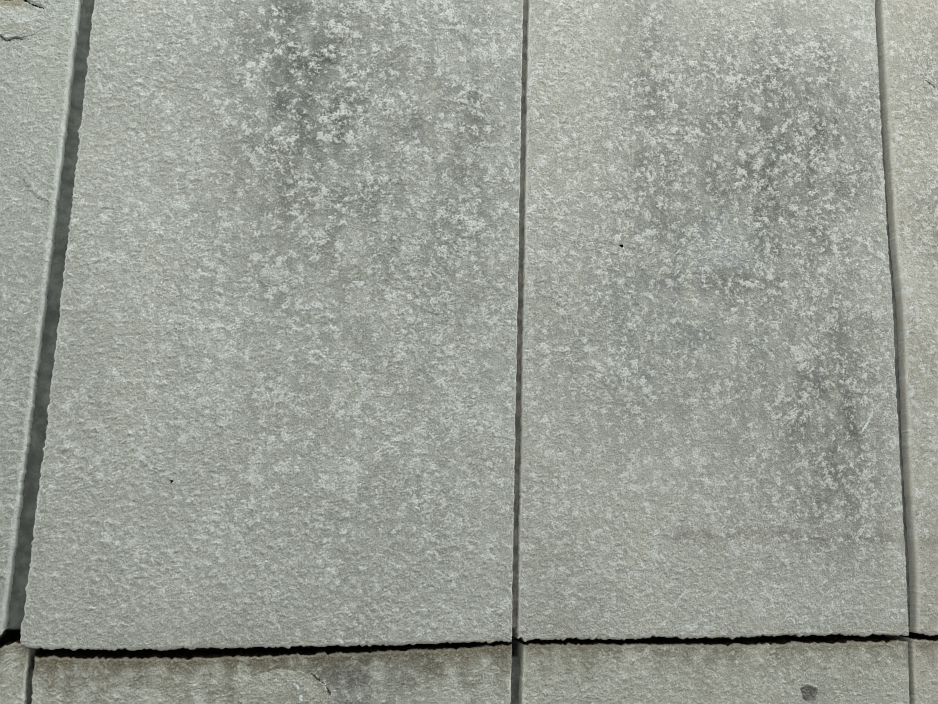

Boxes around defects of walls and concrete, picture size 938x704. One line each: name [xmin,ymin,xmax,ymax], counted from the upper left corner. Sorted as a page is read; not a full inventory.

peeling [0,0,47,10]